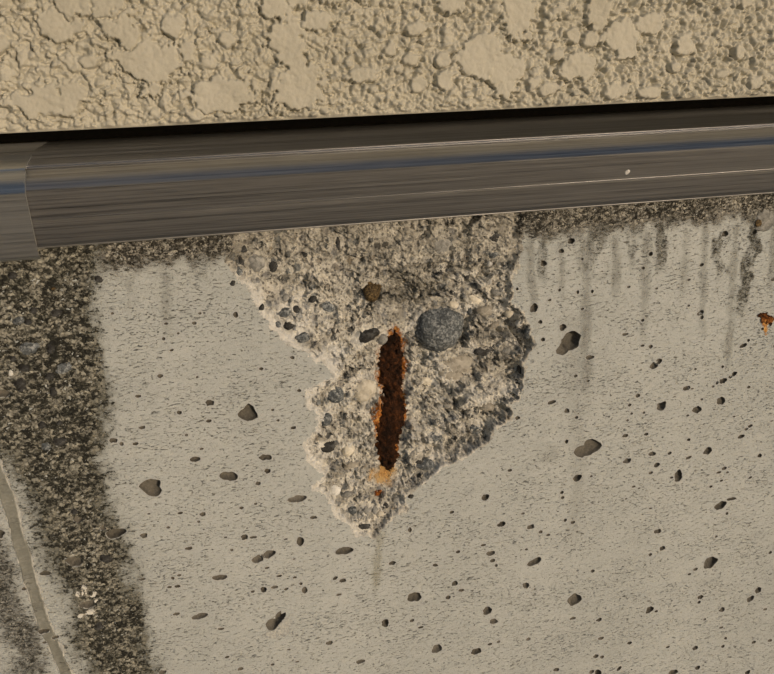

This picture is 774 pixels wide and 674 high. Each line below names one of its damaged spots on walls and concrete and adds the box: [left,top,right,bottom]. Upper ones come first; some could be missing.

water stain [655,221,671,274]
water stain [711,226,729,276]
water stain [736,217,763,316]
rust [757,312,774,335]
water stain [0,244,164,674]
spalling [224,213,537,539]
rust [369,326,409,496]